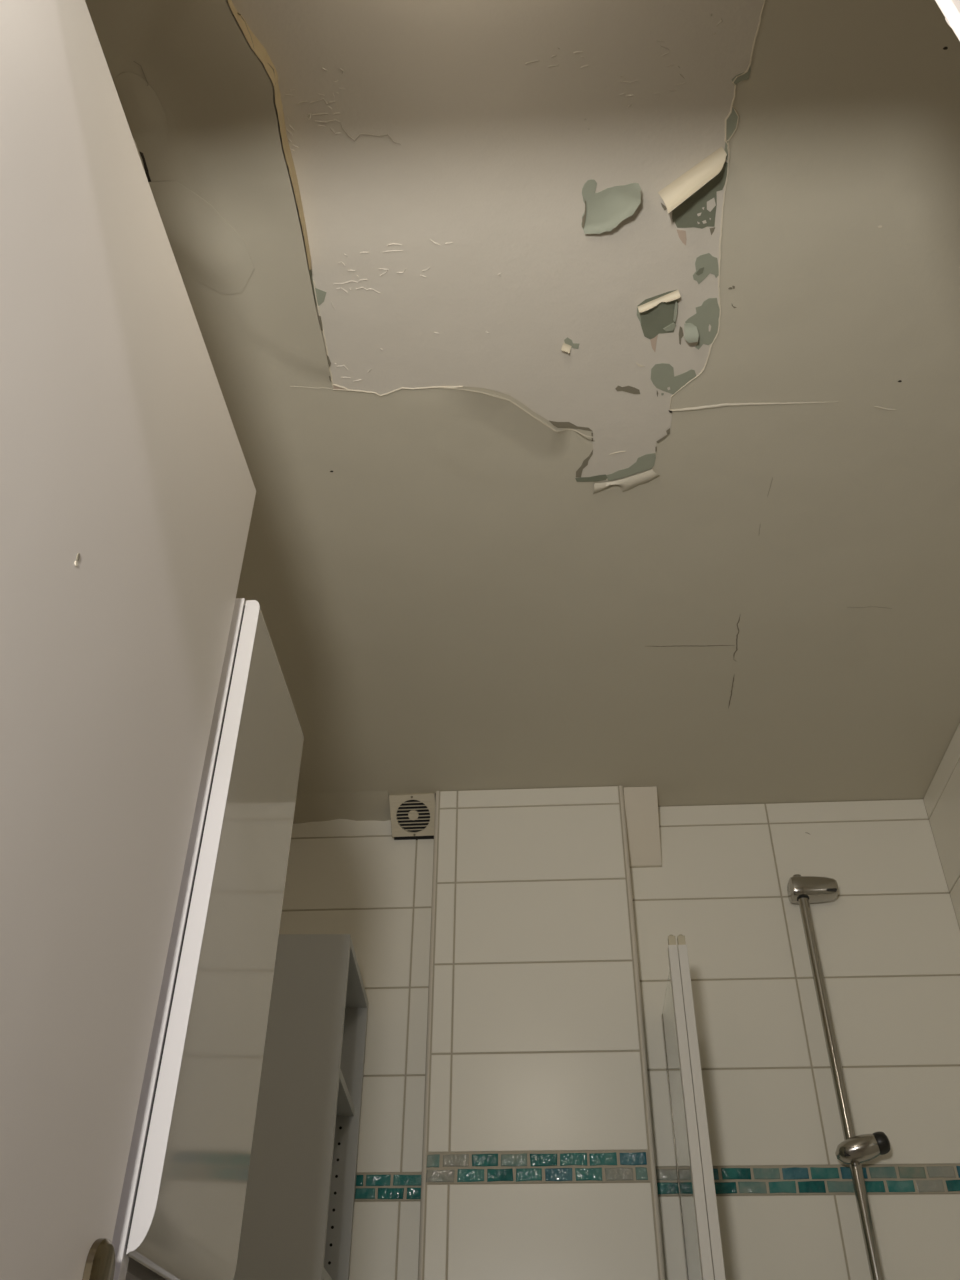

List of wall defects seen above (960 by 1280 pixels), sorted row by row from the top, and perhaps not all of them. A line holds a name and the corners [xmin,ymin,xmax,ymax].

flaking render [112,0,764,482]